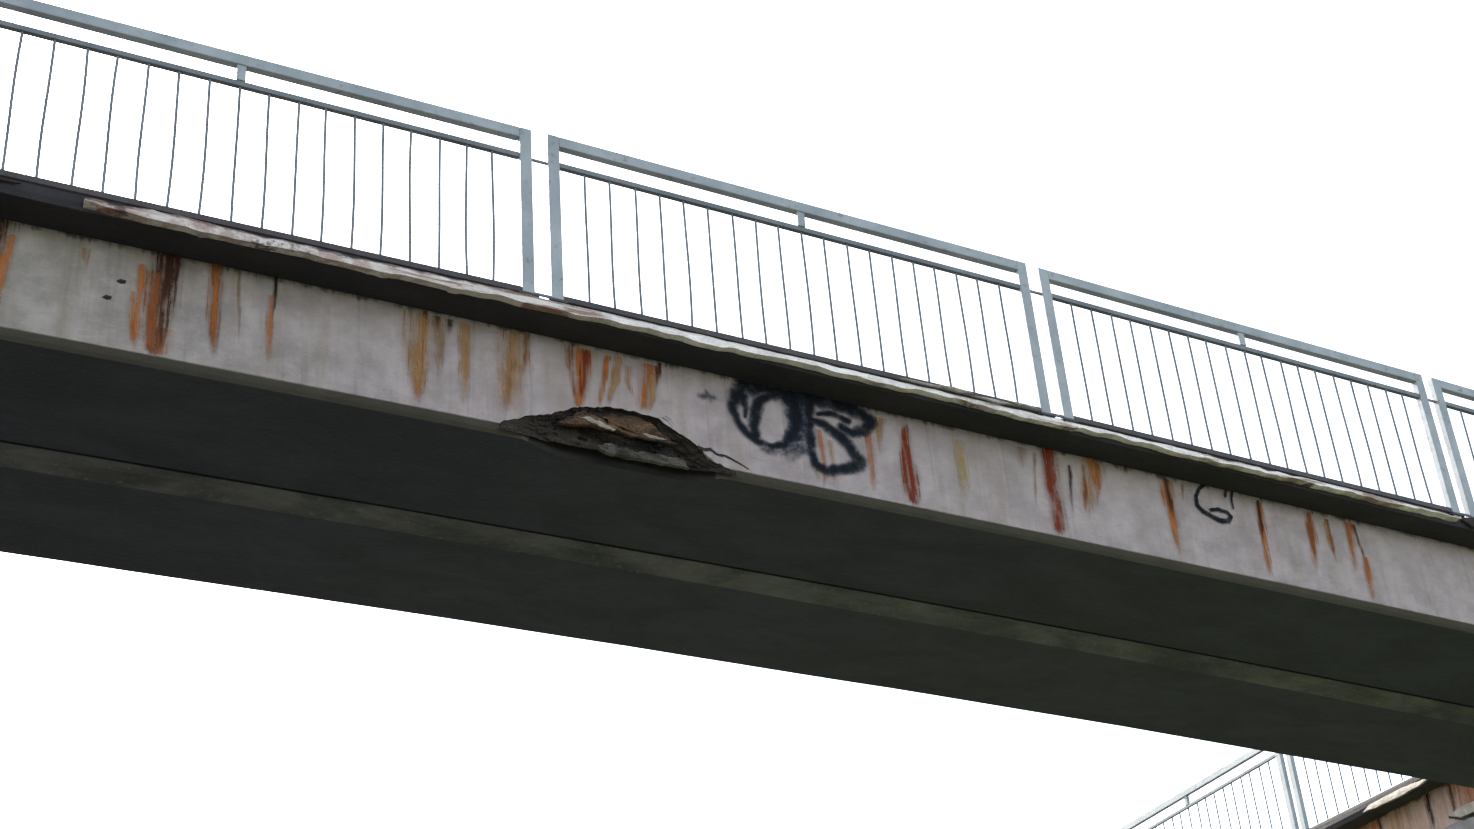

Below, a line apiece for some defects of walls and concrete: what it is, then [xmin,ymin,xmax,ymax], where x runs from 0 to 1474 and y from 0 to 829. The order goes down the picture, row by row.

corrosion [0,219,20,299]
corrosion [130,251,184,353]
corrosion [206,263,241,342]
corrosion [403,310,470,394]
corrosion [498,330,530,397]
corrosion [566,345,661,407]
spalling [500,408,736,476]
corrosion [899,425,921,504]
corrosion [1020,447,1127,533]
corrosion [1161,479,1184,544]
corrosion [1256,500,1272,570]
corrosion [1306,512,1374,595]